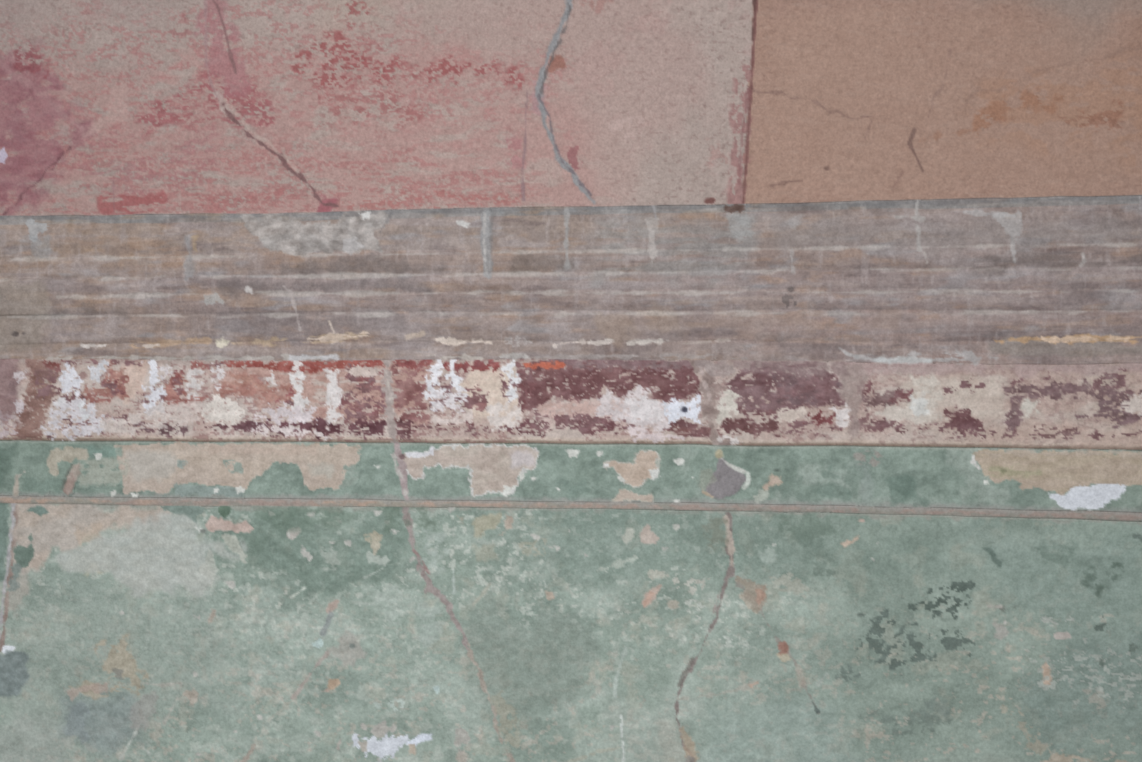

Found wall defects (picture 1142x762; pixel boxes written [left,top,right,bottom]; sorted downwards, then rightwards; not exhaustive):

crack [202,0,340,210]
crack [519,0,597,207]
peeling [0,329,1142,620]
peeling [351,696,434,762]
crack [672,511,830,723]
peeling [1020,615,1142,712]